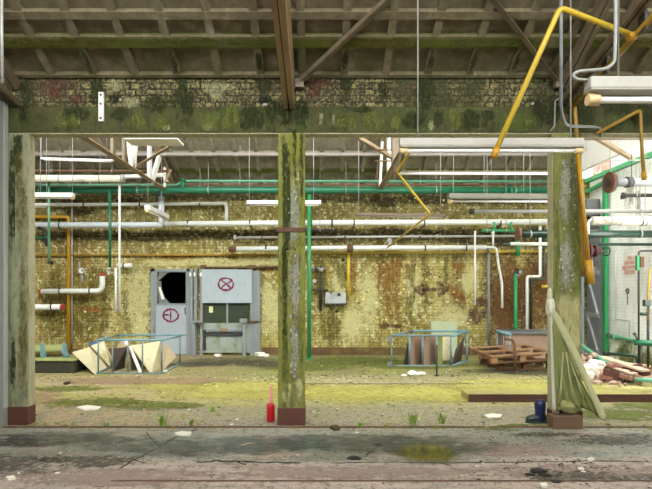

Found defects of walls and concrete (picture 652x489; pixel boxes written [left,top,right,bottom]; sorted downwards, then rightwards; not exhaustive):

leakage [171,78,194,120]
leakage [391,78,462,131]
leakage [9,135,28,279]
leakage [568,162,578,277]
leakage [37,130,547,407]
corrosion [377,260,401,320]
flaking render [622,255,637,274]
leakage [9,294,27,388]
crack [117,429,197,470]
leakage [0,432,496,456]